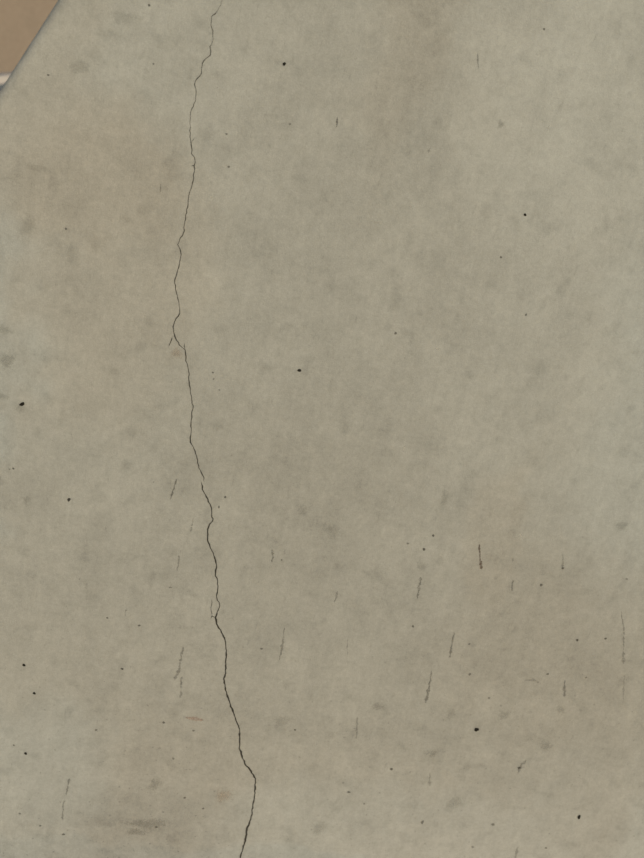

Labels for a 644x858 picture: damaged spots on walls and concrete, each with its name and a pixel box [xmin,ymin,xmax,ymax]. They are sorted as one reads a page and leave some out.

crack [169,5,256,858]